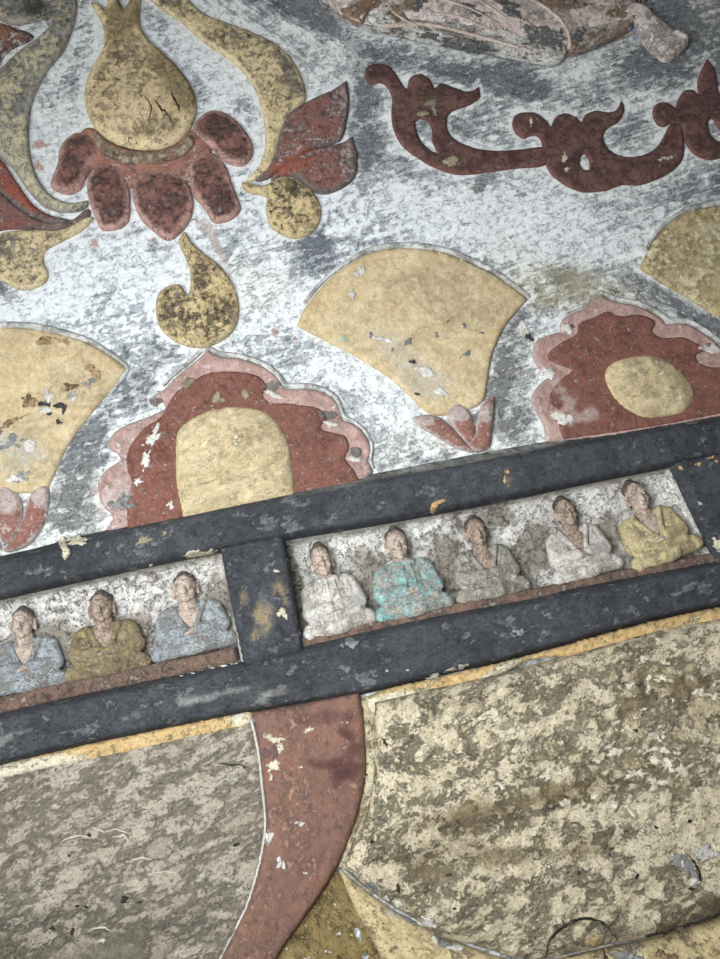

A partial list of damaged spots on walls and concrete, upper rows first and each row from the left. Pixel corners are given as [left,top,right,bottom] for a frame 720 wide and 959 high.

peeling [36,336,72,347]
peeling [0,364,101,454]
peeling [4,470,30,483]
peeling [105,423,162,511]
crack [545,917,618,959]